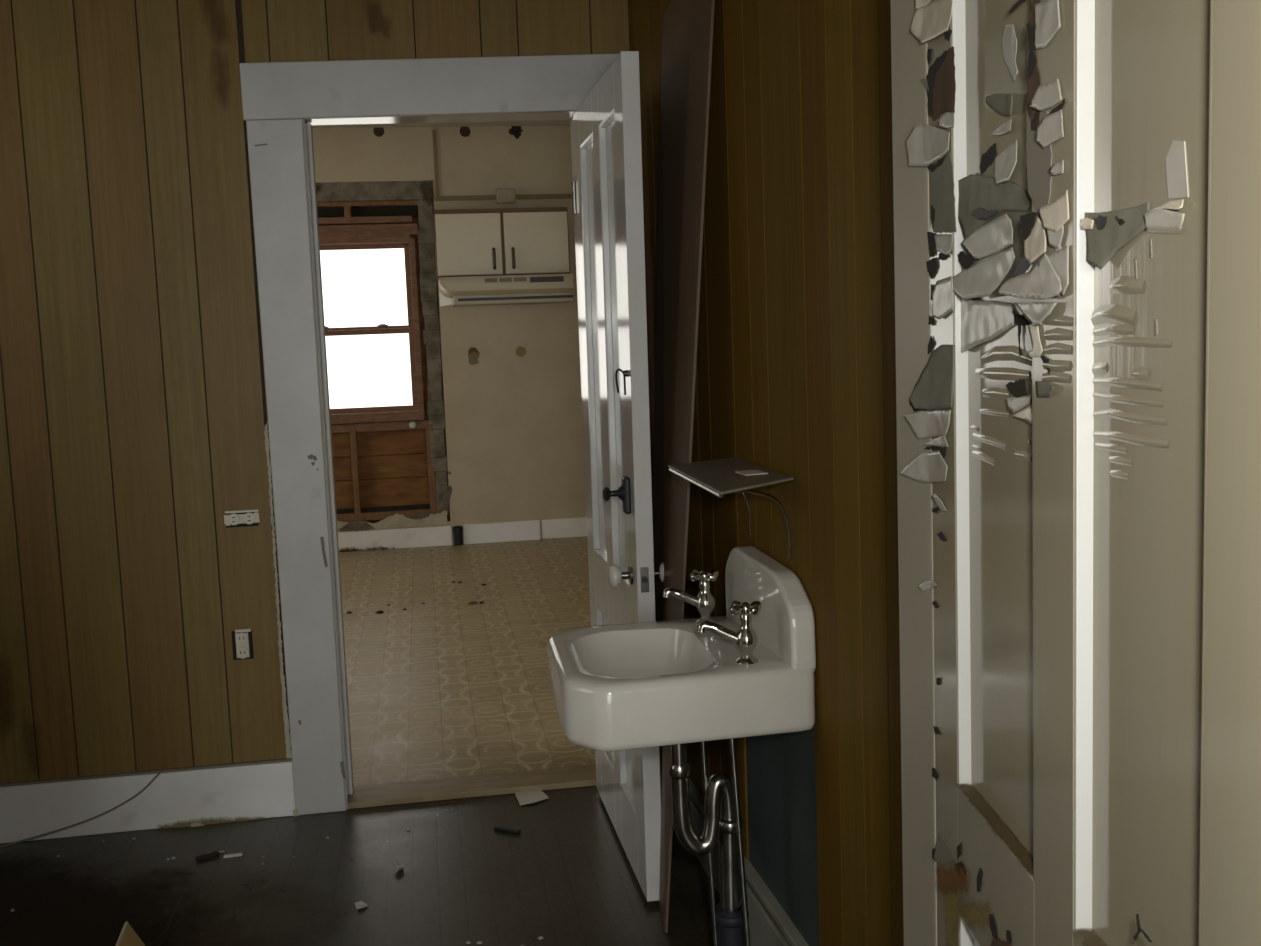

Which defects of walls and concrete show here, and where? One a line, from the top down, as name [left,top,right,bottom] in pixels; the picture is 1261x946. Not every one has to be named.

peeling [900,0,1189,483]
flaking render [337,471,452,531]
peeling [320,537,328,568]
peeling [932,834,983,892]
peeling [989,914,1012,946]